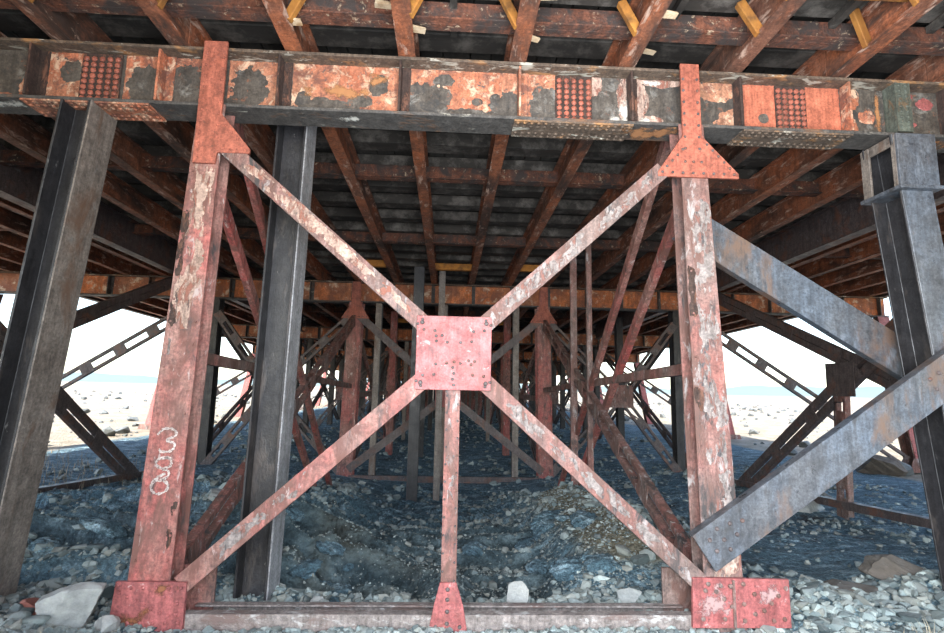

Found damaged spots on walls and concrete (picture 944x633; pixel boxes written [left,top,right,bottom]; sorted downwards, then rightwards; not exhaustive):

peeling [291,63,399,111]
corrosion [326,74,387,99]
peeling [411,69,555,117]
corrosion [622,127,677,139]
corrosion [175,210,189,276]
corrosion [687,265,698,317]
corrosion [168,301,176,326]
corrosion [694,387,704,411]
corrosion [702,584,731,616]
corrosion [760,585,780,604]